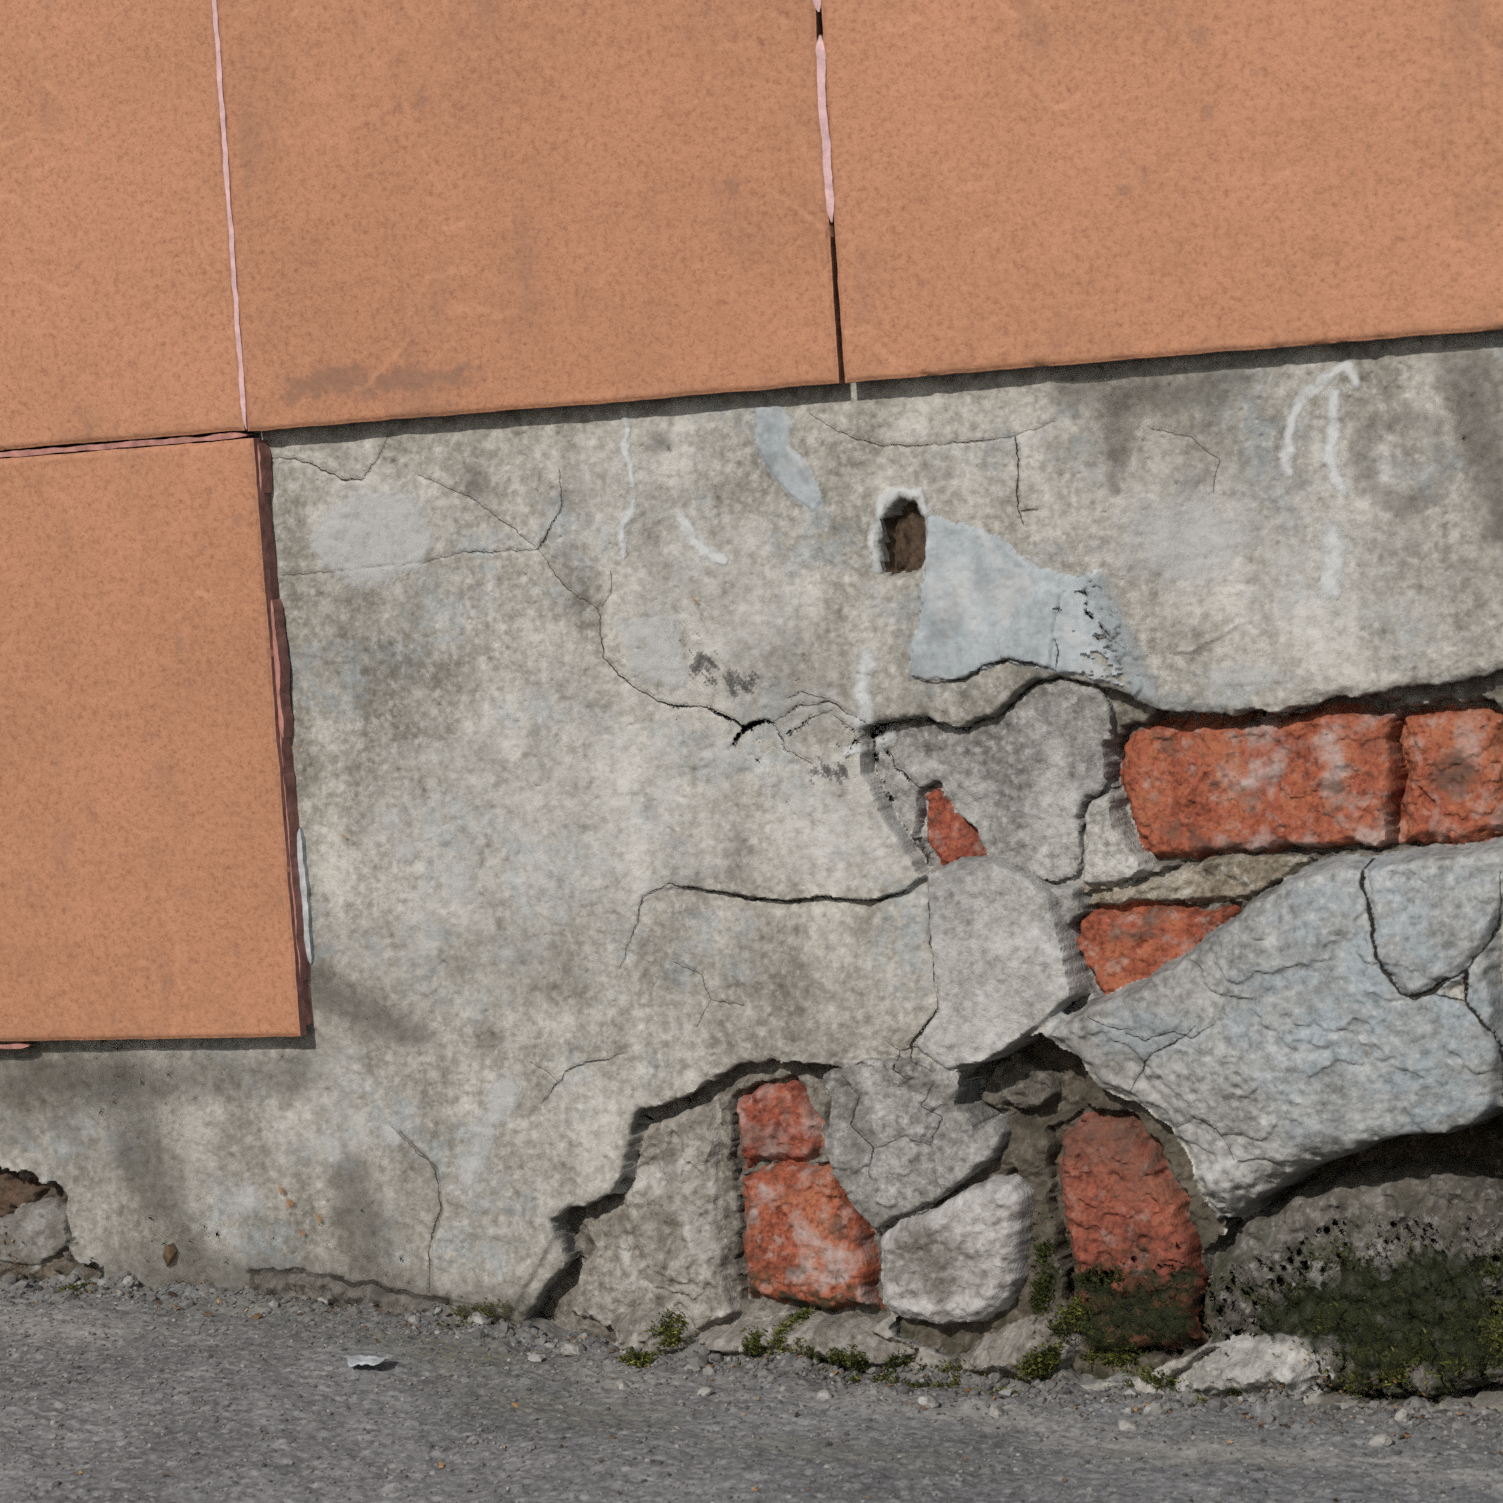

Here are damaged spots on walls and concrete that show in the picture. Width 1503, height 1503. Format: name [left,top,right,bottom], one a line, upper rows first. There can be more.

crack [272,436,388,481]
peeling [753,403,824,514]
crack [810,413,1052,525]
crack [381,471,943,792]
crack [914,638,1058,683]
crack [531,1053,622,1102]
crack [619,875,942,1178]
spalling [538,515,1503,1407]
crack [1089,1017,1214,1093]
crack [1359,858,1503,1097]
spalling [0,1167,103,1284]
crack [390,1125,441,1293]